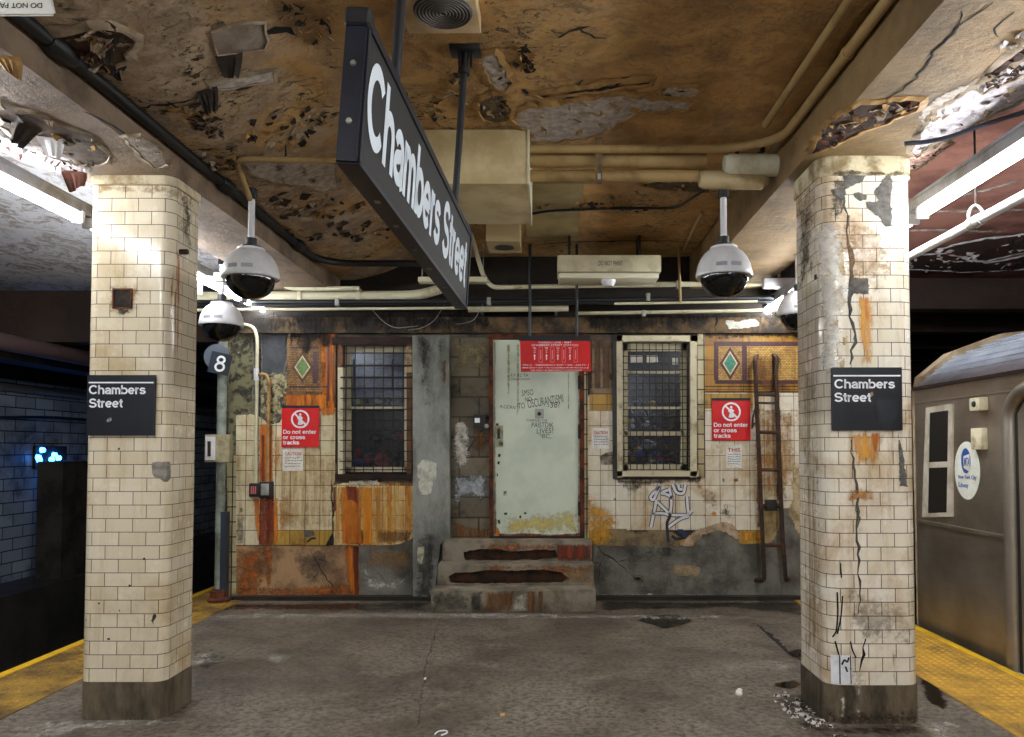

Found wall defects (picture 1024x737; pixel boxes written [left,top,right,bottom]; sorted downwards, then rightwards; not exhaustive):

peeling [0,99,113,192]
spalling [118,133,172,169]
spalling [166,0,390,243]
spalling [421,44,700,145]
peeling [805,32,1024,227]
rust [859,298,872,361]
spalling [152,462,171,482]
peeling [417,460,437,495]
rust [855,433,879,462]
rust [236,477,413,595]
crack [850,440,861,614]
crack [858,639,866,672]